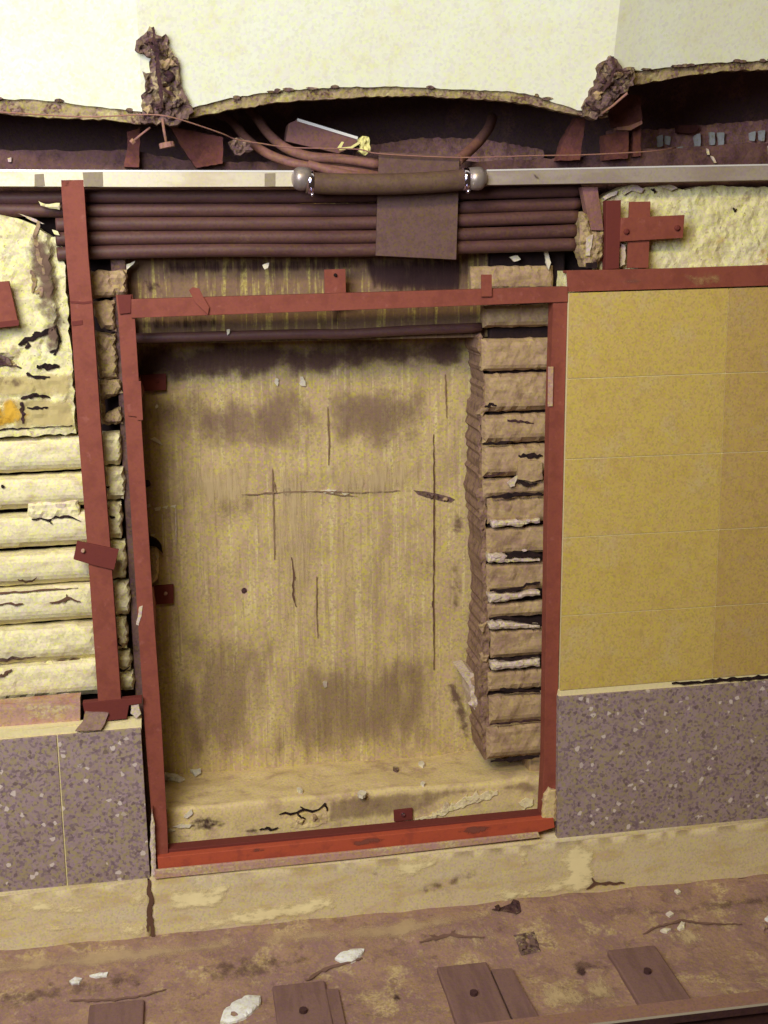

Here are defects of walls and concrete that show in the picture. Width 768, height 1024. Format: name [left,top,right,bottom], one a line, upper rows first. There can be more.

peeling [142,38,183,120]
peeling [586,72,630,114]
crack [324,407,332,465]
flaking render [507,459,543,487]
crack [242,469,400,638]
spalling [414,332,501,760]
water stain [449,685,467,730]
crack [259,803,328,831]
crack [146,880,155,937]